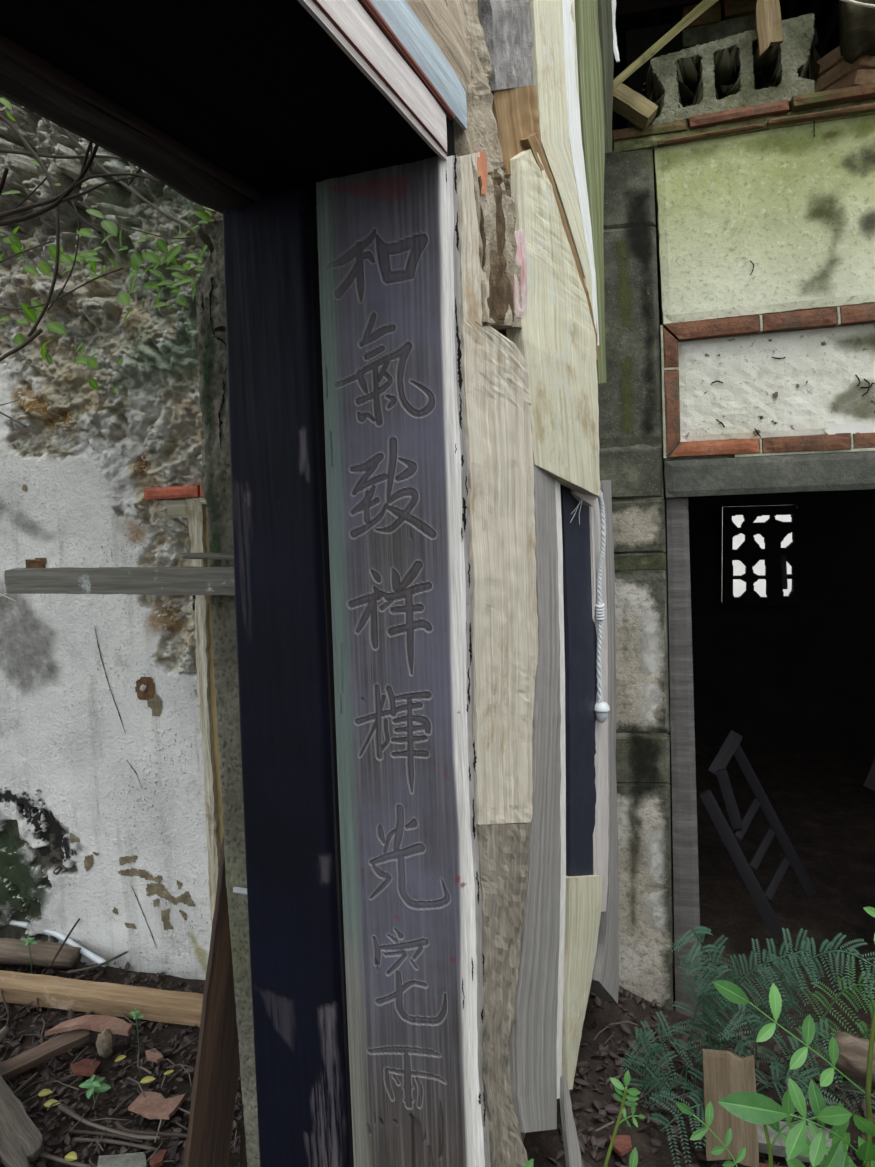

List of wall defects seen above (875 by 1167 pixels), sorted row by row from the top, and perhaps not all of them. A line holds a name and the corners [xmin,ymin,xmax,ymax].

water stain [847,150,875,171]
water stain [810,197,841,224]
water stain [863,212,875,231]
water stain [831,381,875,417]
water stain [641,615,661,722]
corrosion [135,677,155,700]
water stain [630,729,665,929]
flaking render [84,852,99,871]
flaking render [118,855,195,930]